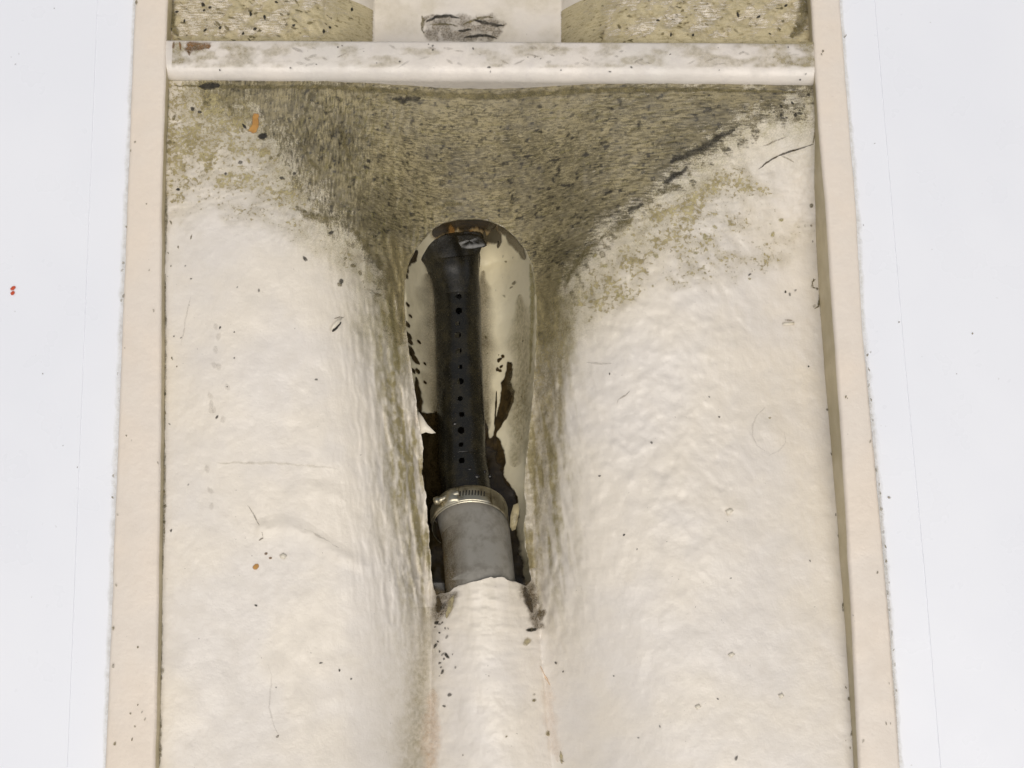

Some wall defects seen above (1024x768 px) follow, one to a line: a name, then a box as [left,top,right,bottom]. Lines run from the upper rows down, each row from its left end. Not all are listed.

rust [242,114,267,139]
peeling [406,302,438,442]
water stain [165,80,814,490]
peeling [485,354,519,531]